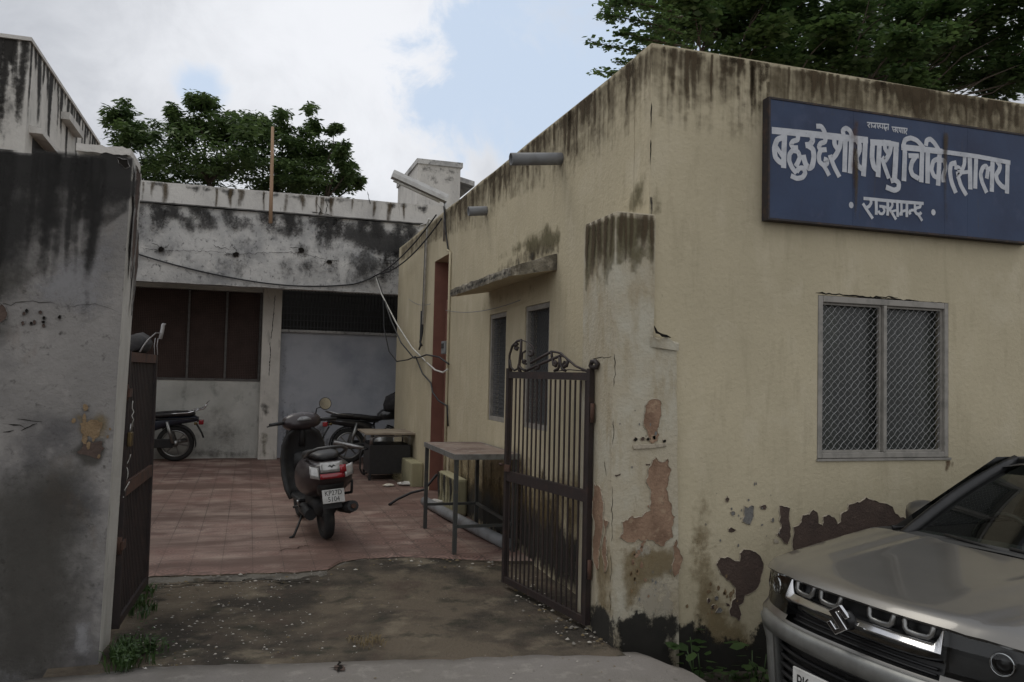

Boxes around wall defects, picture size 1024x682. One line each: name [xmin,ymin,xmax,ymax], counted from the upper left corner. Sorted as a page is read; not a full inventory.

leakage [0,38,1024,289]
spalling [71,404,111,464]
leakage [0,474,89,680]
peeling [592,398,683,601]
leakage [590,551,768,673]
peeling [706,544,764,621]
peeling [716,493,905,551]